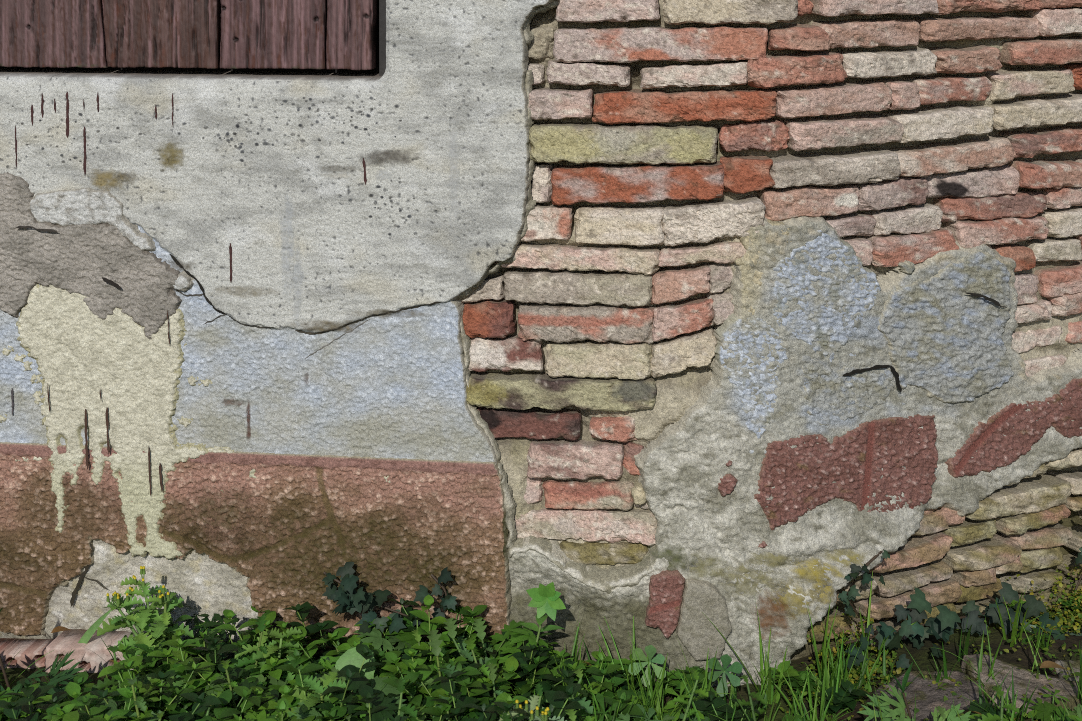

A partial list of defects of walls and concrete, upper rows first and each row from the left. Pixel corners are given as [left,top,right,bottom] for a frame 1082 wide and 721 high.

spalling [523,0,559,45]
rust [31,92,69,138]
flaking render [29,187,156,252]
spalling [520,143,536,238]
spalling [453,256,516,300]
spalling [460,313,471,387]
crack [843,365,902,392]
flaking render [714,219,1082,531]
rust [100,389,110,454]
rust [148,447,163,496]
spalling [467,404,685,639]
spalling [0,539,258,658]